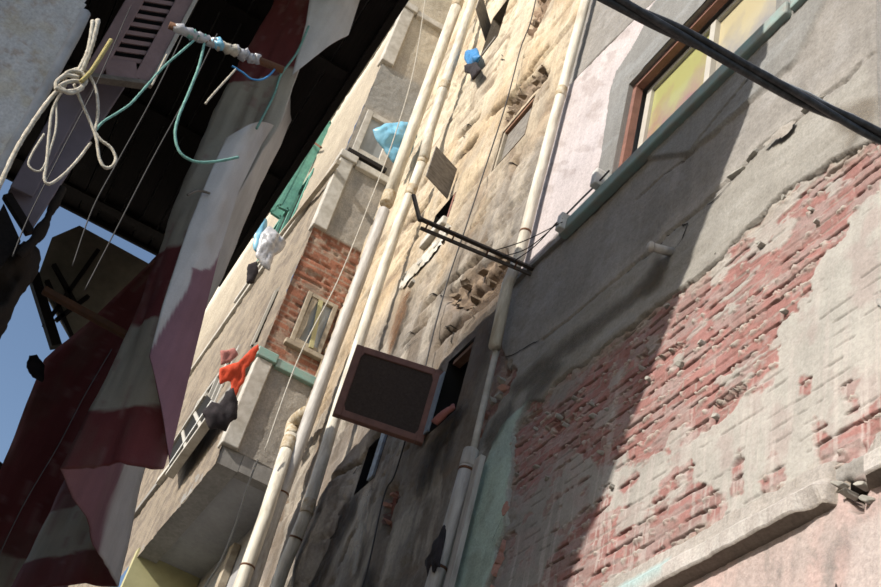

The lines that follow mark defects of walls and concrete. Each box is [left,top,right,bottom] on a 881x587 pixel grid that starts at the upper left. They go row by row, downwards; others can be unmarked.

spalling [527,0,551,39]
flaking render [726,108,809,180]
spalling [449,252,510,311]
spalling [473,349,517,444]
spalling [490,143,881,587]